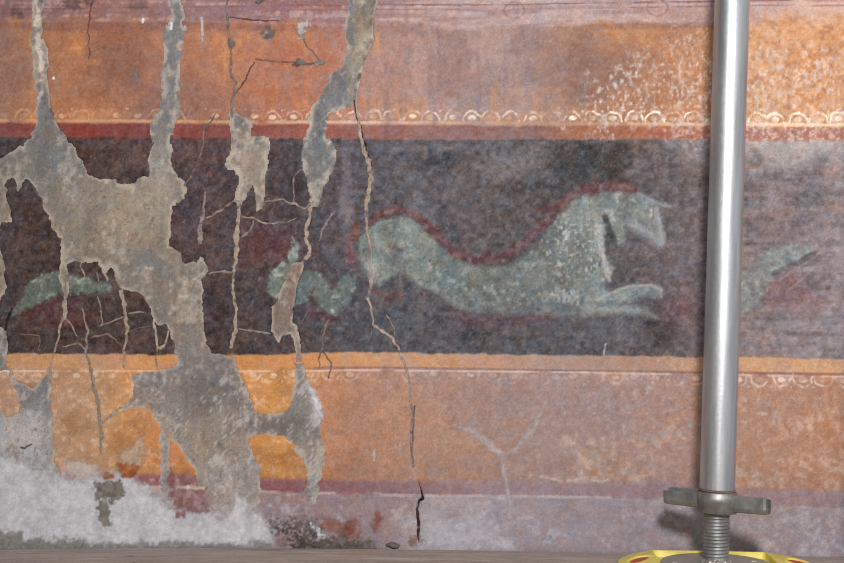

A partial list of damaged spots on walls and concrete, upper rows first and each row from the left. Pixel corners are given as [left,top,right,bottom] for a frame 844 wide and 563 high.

spalling [0,0,325,521]
water stain [0,439,376,549]
crack [183,0,335,349]
water stain [309,387,323,418]
spalling [301,0,378,207]
crack [354,93,424,543]